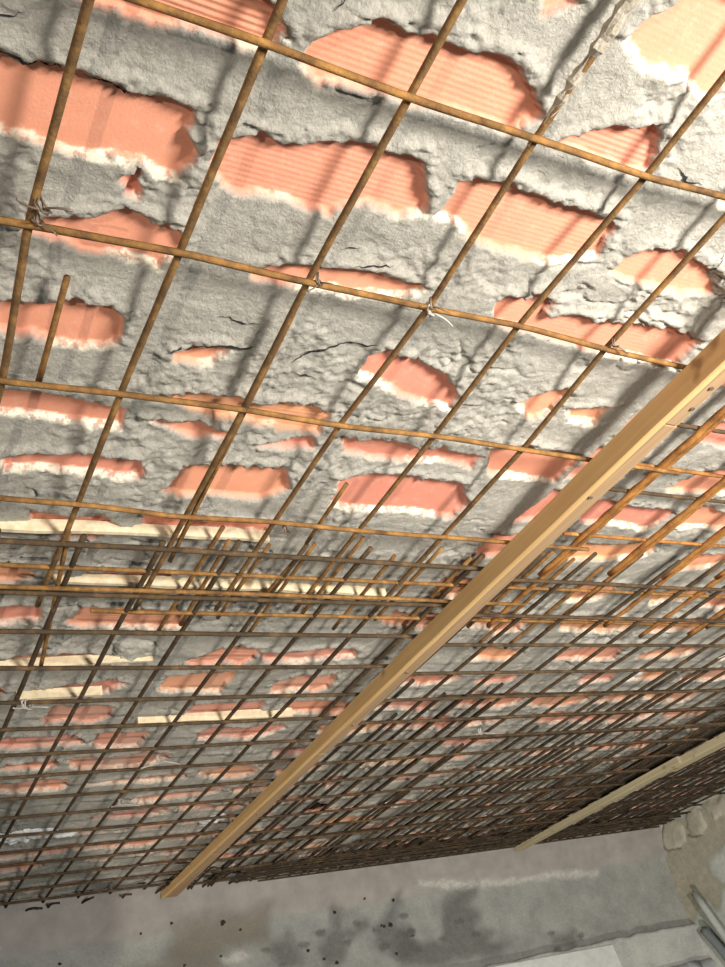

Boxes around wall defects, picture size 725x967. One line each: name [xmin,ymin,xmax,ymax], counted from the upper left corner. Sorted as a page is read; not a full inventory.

crack [0,50,149,97]
spalling [706,254,725,302]
spalling [187,405,725,890]
leakage [379,869,598,963]